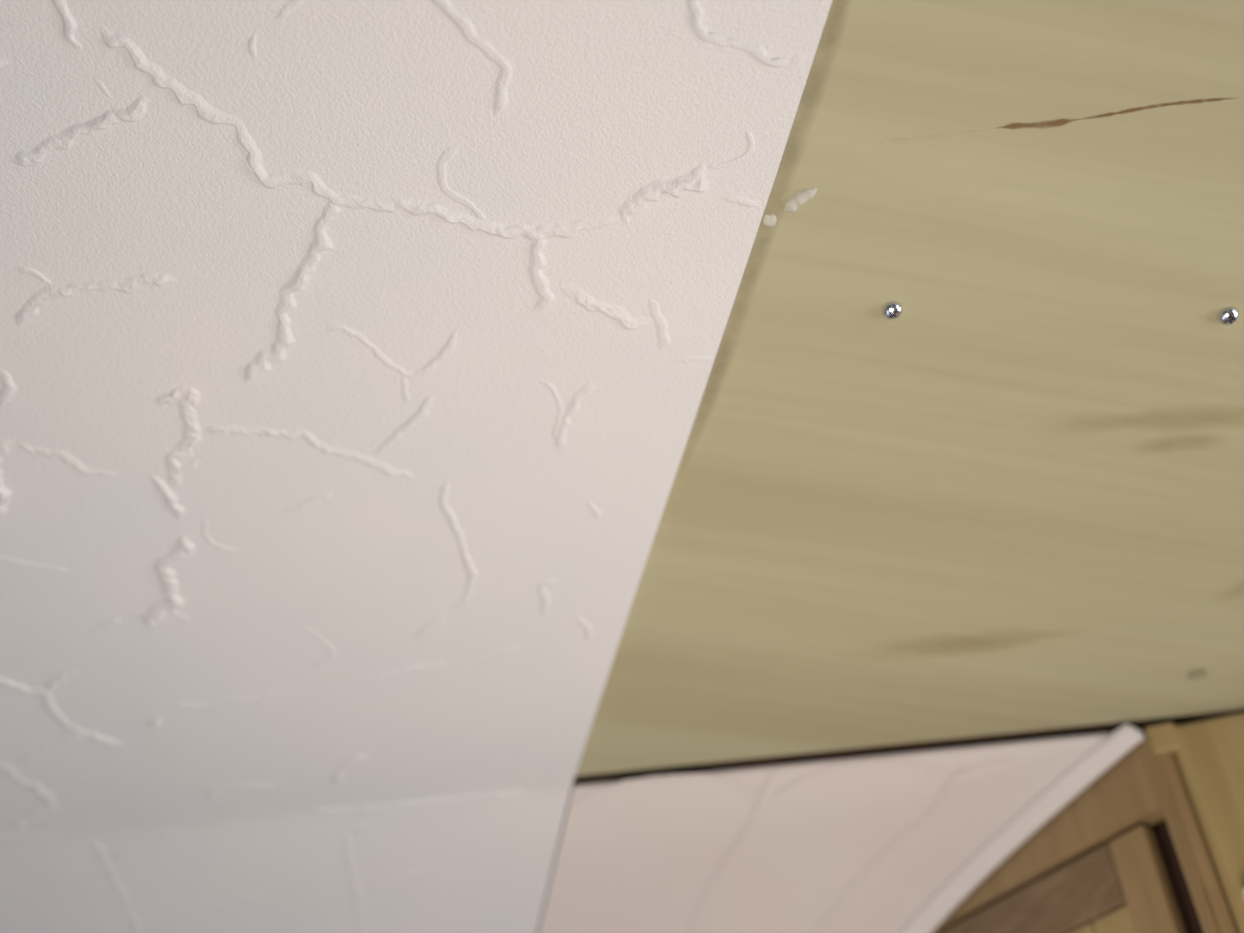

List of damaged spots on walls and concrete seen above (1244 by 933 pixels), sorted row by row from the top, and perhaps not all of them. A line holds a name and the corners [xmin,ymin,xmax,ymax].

crack [687,0,808,71]
crack [1003,99,1224,128]
crack [8,0,761,456]
crack [0,367,17,409]
crack [0,387,239,629]